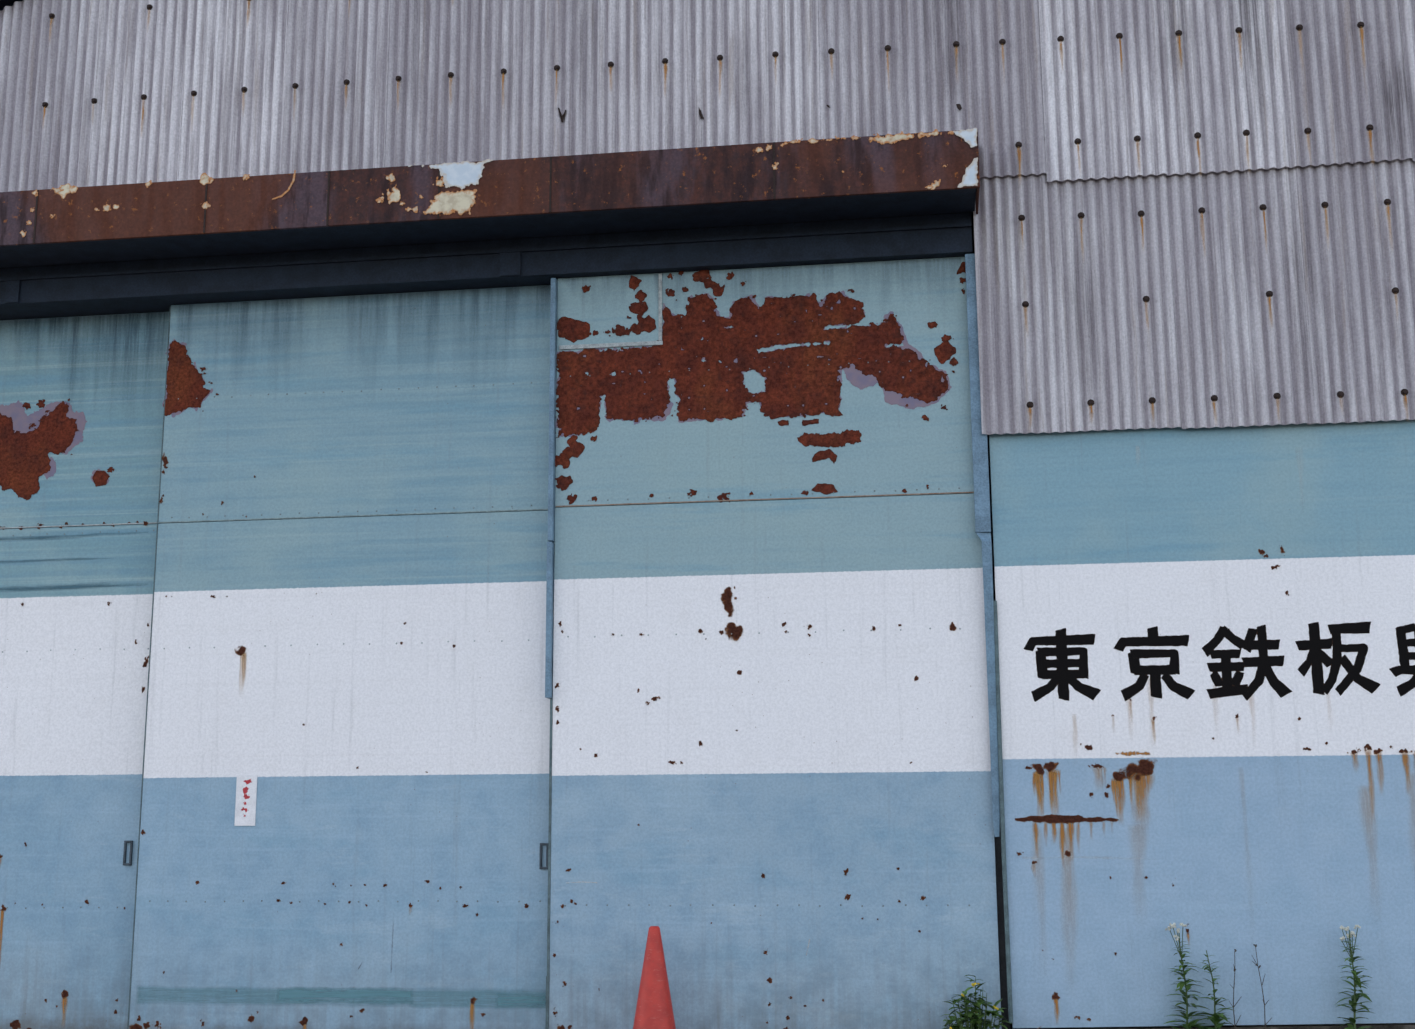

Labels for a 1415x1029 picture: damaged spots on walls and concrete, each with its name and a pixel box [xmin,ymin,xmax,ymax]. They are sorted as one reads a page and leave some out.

peeling [376,159,493,215]
rust [698,586,743,641]
rust [1347,744,1412,792]
rust [1015,743,1154,864]
rust [0,903,16,952]
rust [129,1015,161,1029]
rust [470,997,485,1028]